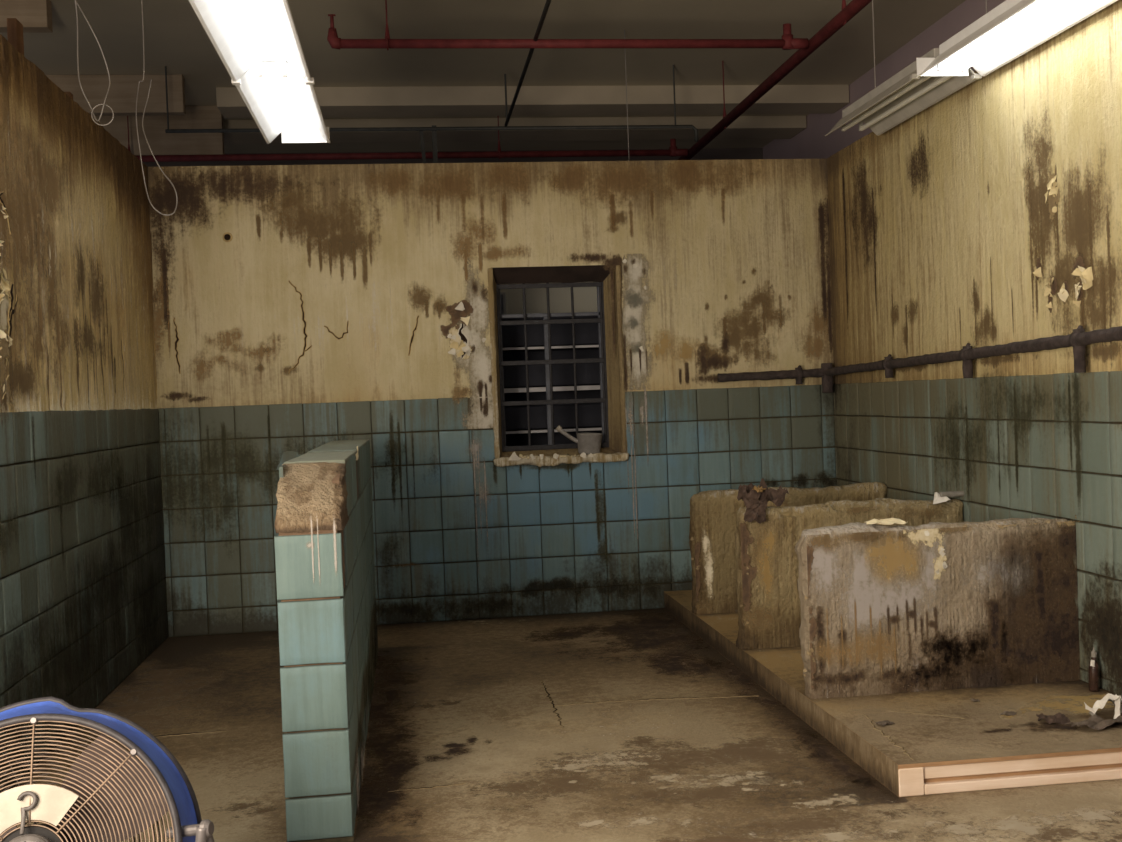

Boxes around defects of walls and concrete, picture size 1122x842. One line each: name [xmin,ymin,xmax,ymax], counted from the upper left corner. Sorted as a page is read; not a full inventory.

damp [256,185,380,285]
crack [288,280,349,374]
flaking render [441,265,494,429]
flaking render [622,253,655,390]
damp [679,268,791,384]
damp [973,259,997,346]
flaking render [1033,253,1093,313]
damp [1024,111,1122,365]
spalling [274,446,358,587]
damp [355,462,660,805]
spalling [903,528,948,579]
damp [809,521,1122,697]